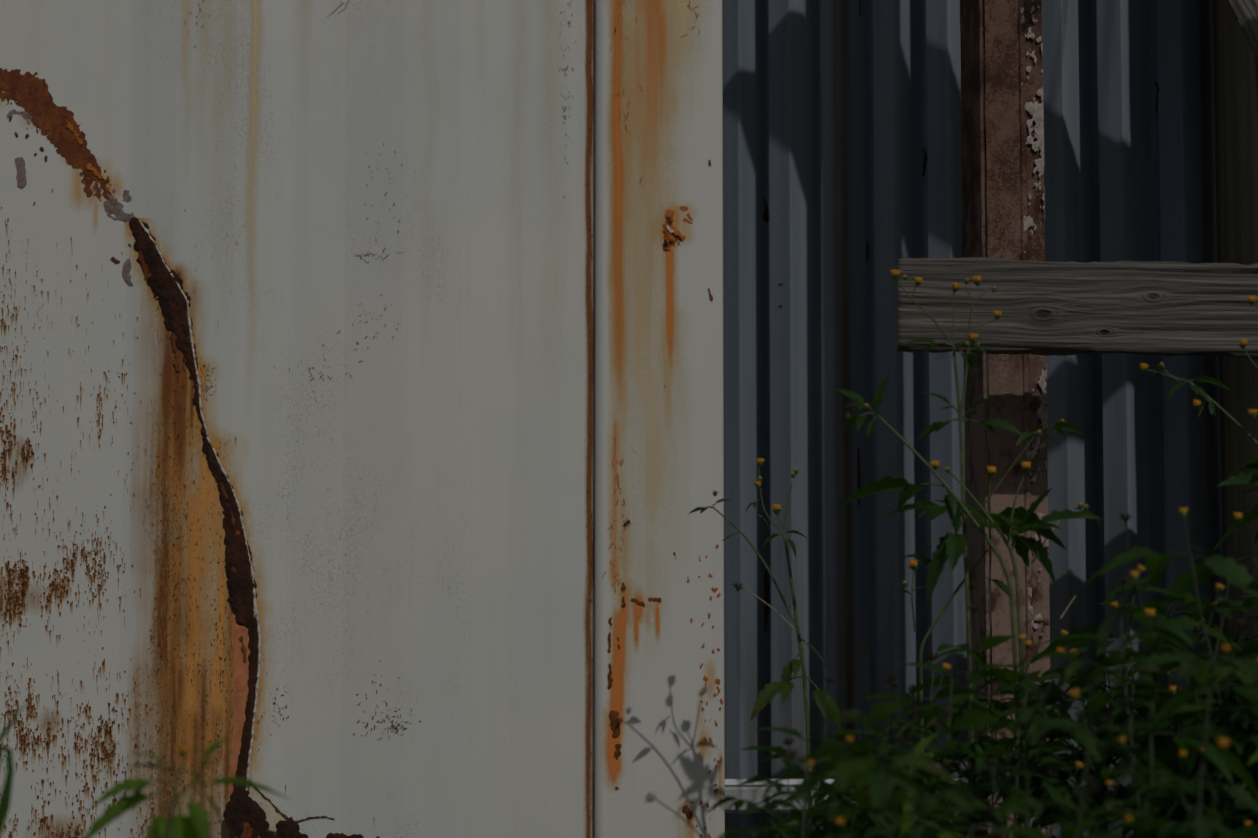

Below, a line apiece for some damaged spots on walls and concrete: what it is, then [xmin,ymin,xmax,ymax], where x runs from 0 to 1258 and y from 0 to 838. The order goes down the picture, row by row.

crack [274,130,417,381]
corrosion [660,206,693,364]
corrosion [0,207,308,838]
crack [125,217,335,838]
corrosion [585,0,667,838]
crack [353,661,420,741]
corrosion [682,805,694,837]